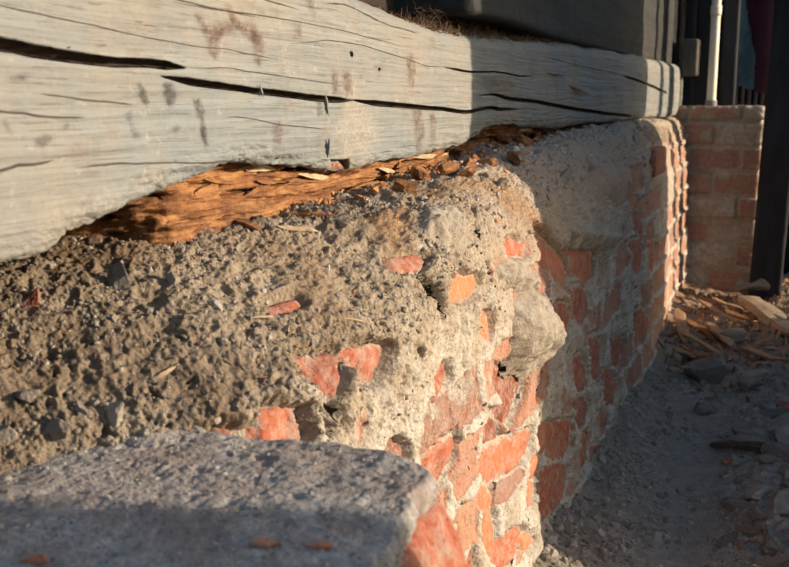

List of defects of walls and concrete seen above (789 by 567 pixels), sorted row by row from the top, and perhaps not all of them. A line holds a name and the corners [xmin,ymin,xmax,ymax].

spalling [258,299,301,315]
spalling [382,255,424,275]
crack [416,274,447,319]
spalling [447,273,476,304]
spalling [503,237,524,259]
spalling [534,230,592,332]
spalling [294,343,381,403]
spalling [430,364,444,404]
spalling [208,406,301,440]
spalling [384,438,402,456]
spalling [419,432,453,481]
spalling [476,332,623,567]